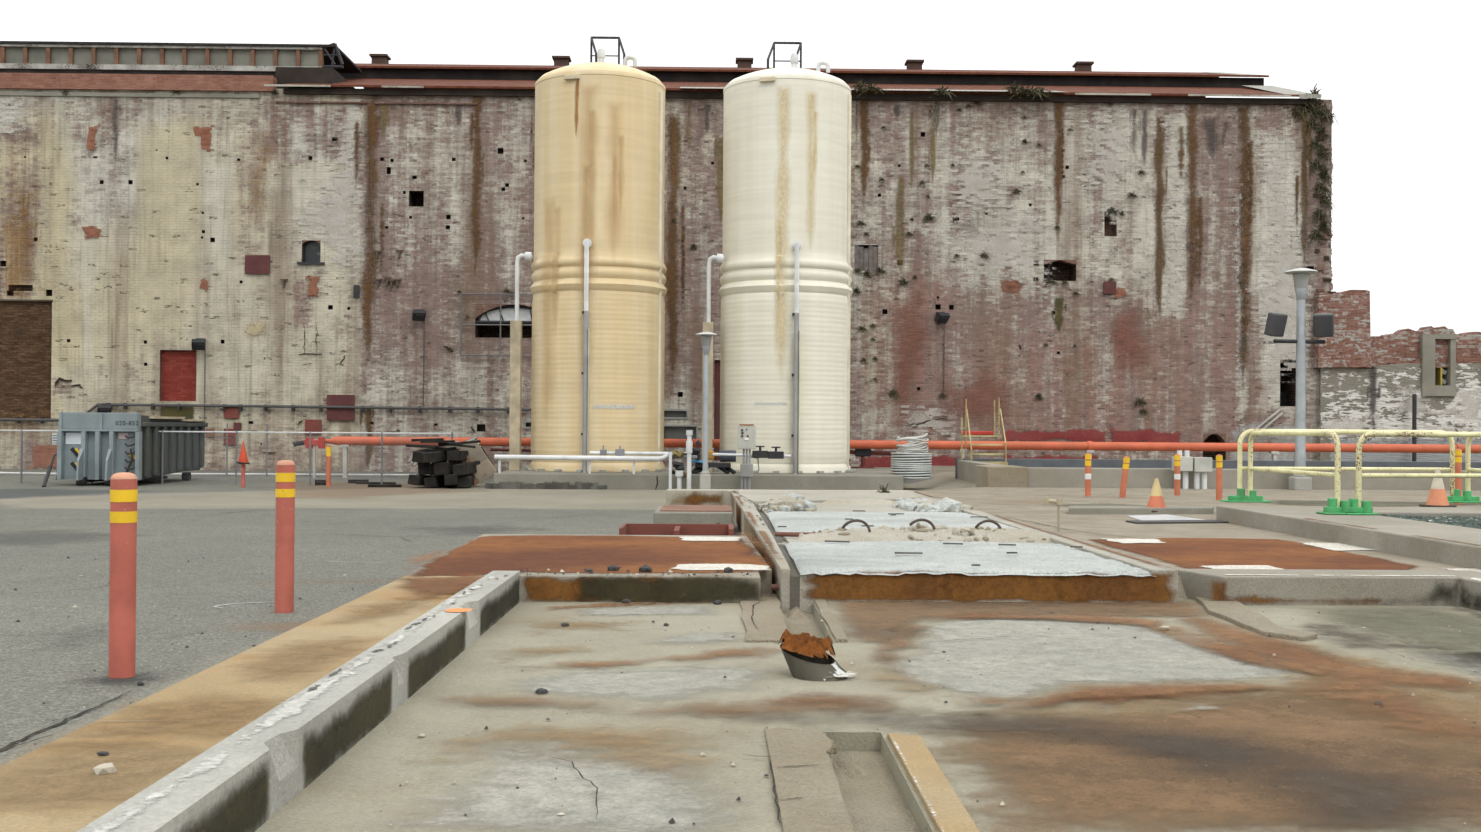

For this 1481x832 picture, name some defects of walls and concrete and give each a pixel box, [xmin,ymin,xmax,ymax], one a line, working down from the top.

water stain [286,105,389,282]
water stain [1076,109,1190,316]
water stain [1233,132,1312,432]
crack [0,692,155,753]
corrosion [360,491,779,617]
corrosion [776,629,836,659]
corrosion [807,516,1481,691]